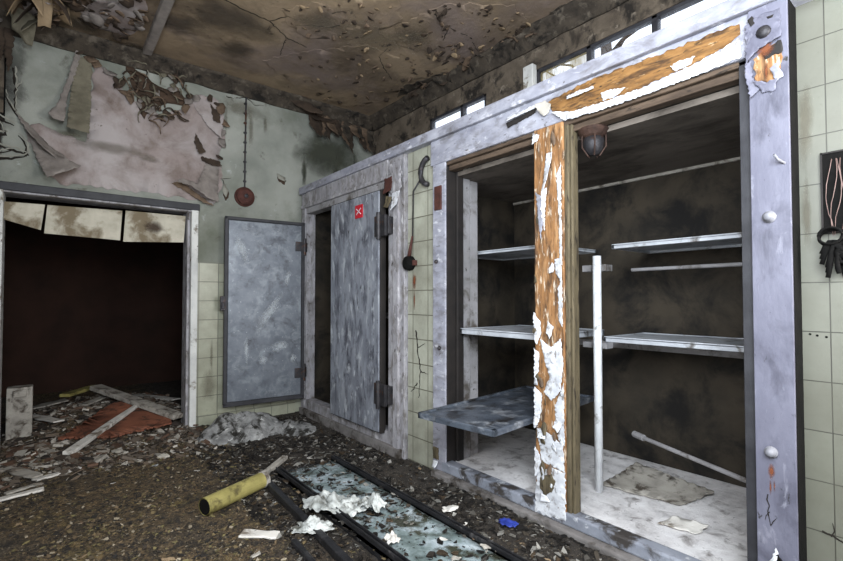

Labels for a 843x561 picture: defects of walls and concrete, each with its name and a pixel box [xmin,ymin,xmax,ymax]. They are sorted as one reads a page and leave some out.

peeling [0,0,149,71]
peeling [15,50,230,206]
crack [225,0,349,55]
peeling [506,8,783,128]
peeling [532,131,567,521]